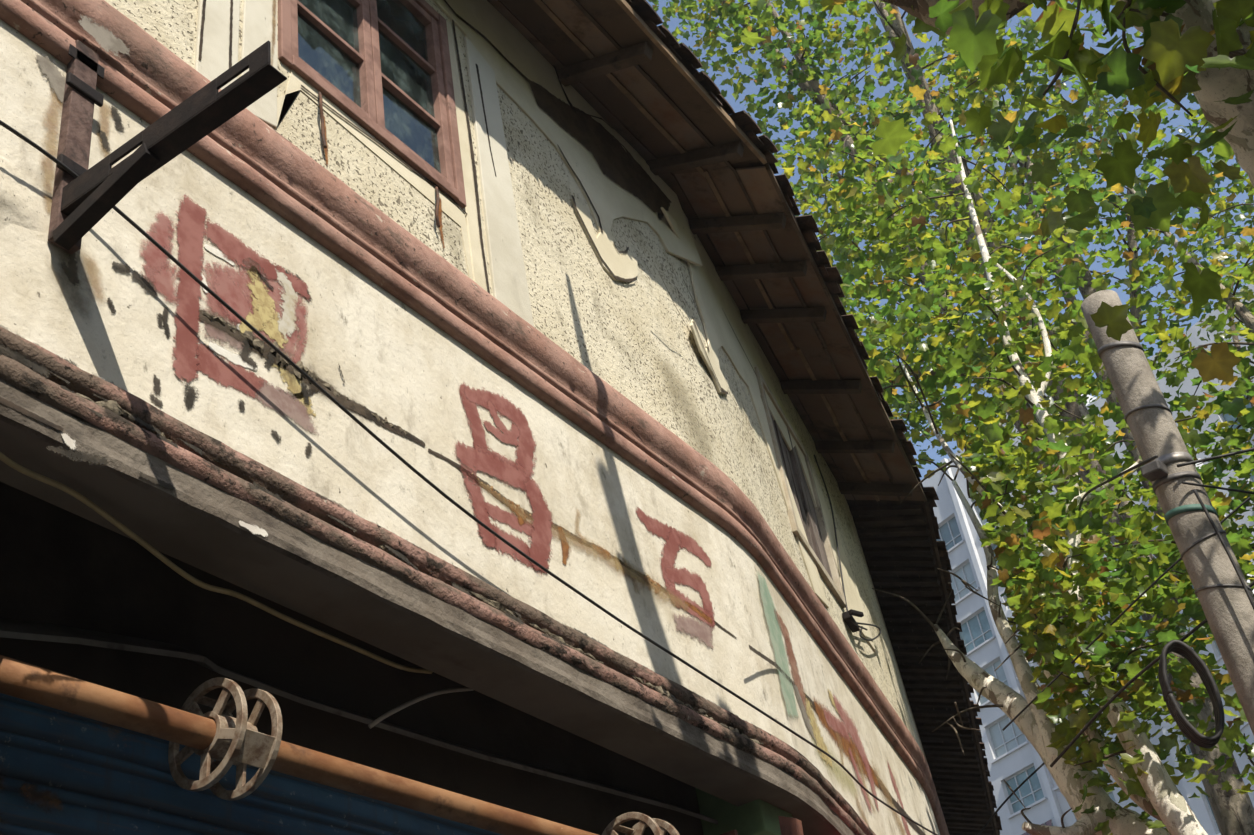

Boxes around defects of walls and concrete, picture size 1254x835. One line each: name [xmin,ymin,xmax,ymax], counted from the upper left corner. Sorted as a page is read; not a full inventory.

spalling [239,520,268,537]
spalling [377,533,418,570]
spalling [447,580,620,664]